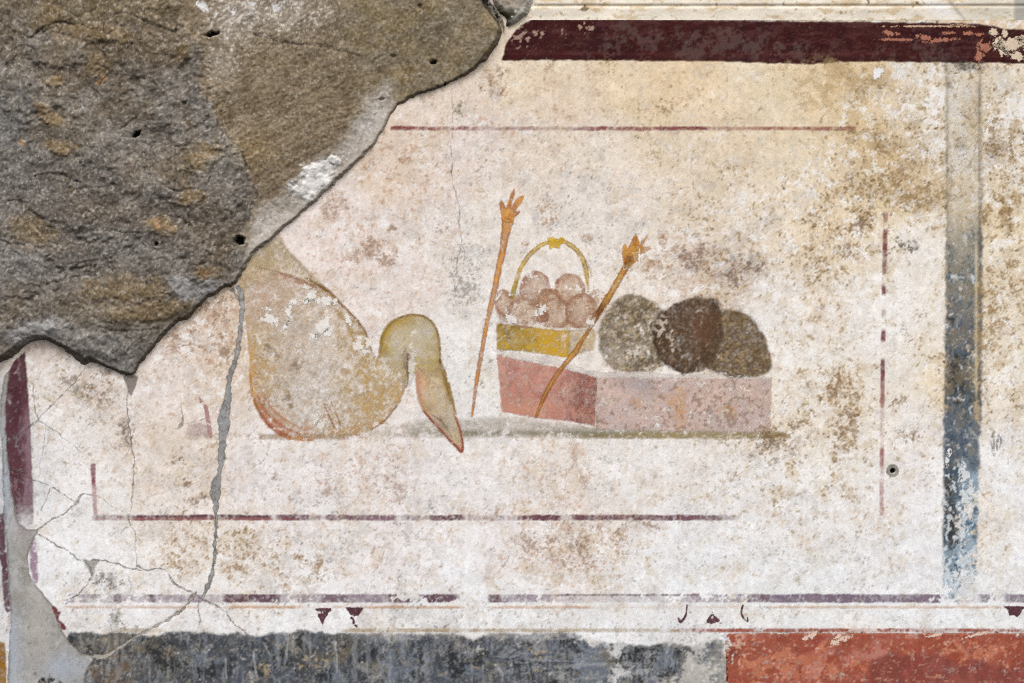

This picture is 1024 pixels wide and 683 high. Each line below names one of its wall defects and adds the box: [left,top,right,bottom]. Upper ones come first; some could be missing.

flaking render [0,0,502,376]
peeling [873,24,1024,63]
crack [13,285,254,660]